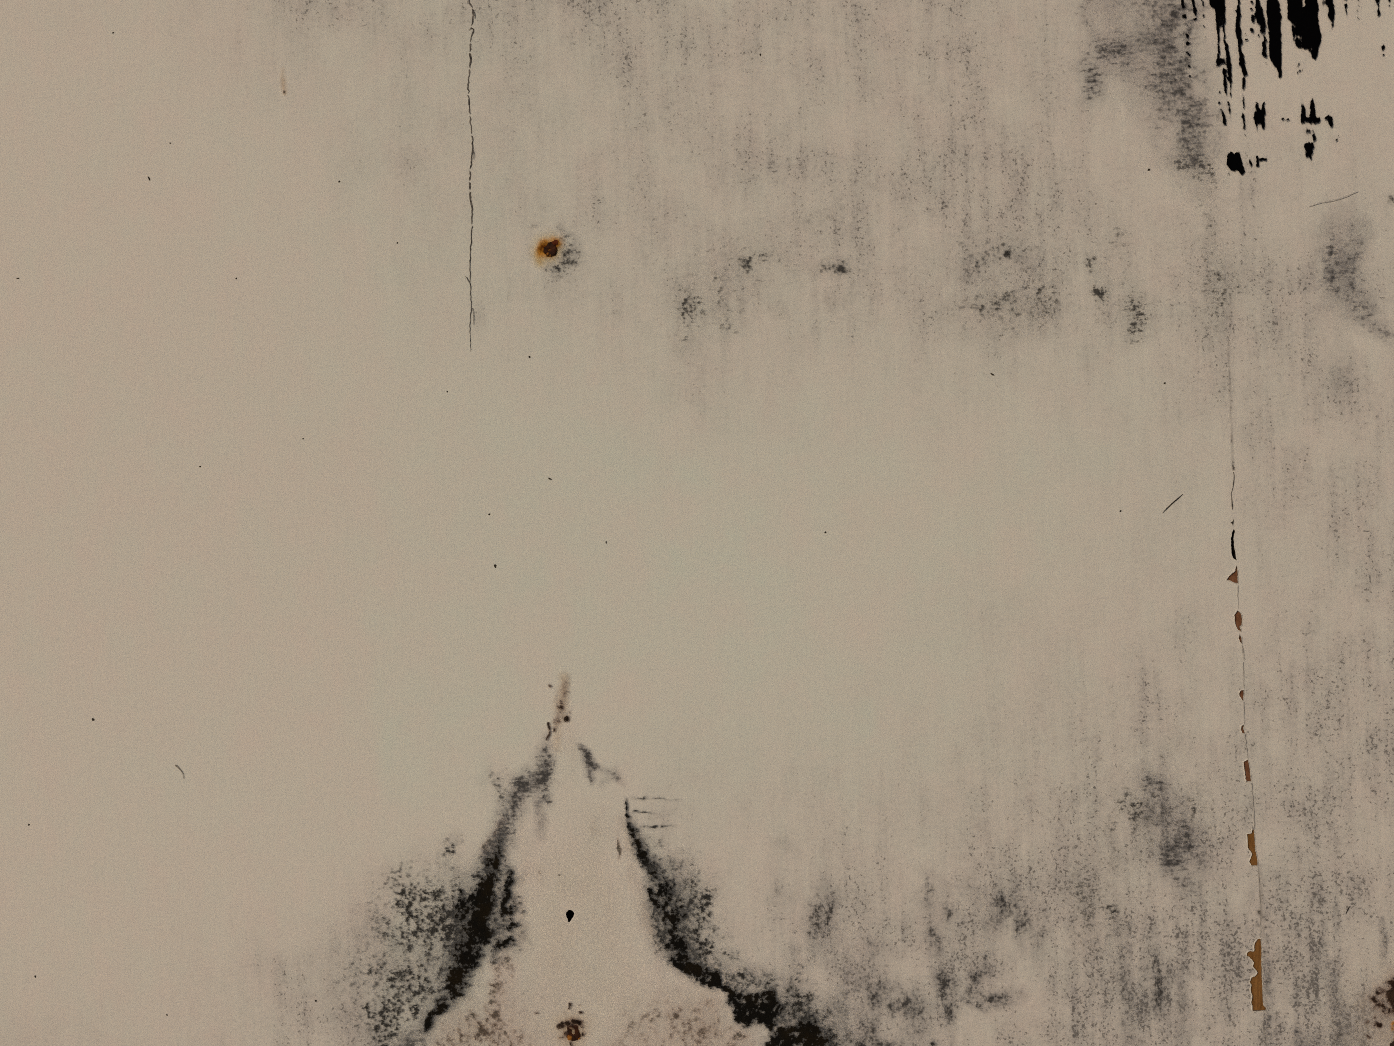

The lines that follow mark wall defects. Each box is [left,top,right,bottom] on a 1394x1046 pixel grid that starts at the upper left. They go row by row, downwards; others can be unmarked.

peeling [1181,0,1391,159]
crack [466,0,475,352]
peeling [1226,152,1267,175]
rust [534,238,560,264]
spalling [1233,609,1244,644]
leakage [578,744,619,782]
spalling [1246,828,1259,866]
leakage [344,746,555,1046]
leakage [617,797,1009,1046]
leakage [985,885,1044,937]
spalling [1245,938,1267,1012]
rust [556,1003,584,1046]